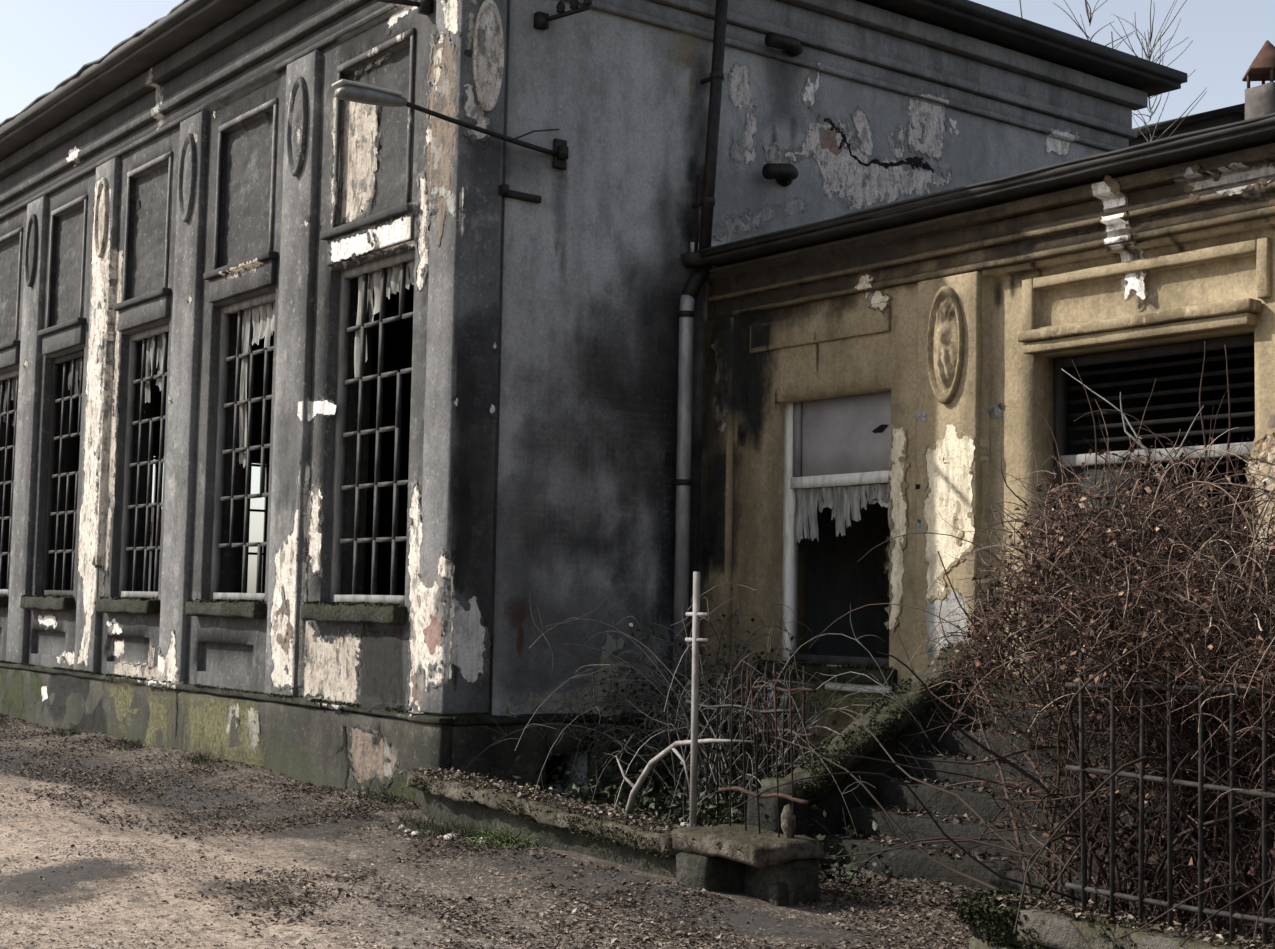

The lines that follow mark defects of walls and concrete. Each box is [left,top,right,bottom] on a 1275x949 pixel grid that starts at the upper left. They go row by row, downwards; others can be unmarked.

peeling [329,0,492,290]
peeling [725,60,959,211]
crack [818,116,934,174]
peeling [1089,175,1147,301]
leakage [49,673,109,734]
peeling [57,180,186,690]
peeling [268,461,363,714]
peeling [349,724,399,790]
peeling [403,480,491,716]
leakage [700,210,989,578]
peeling [884,422,991,658]
spalling [1246,414,1275,573]